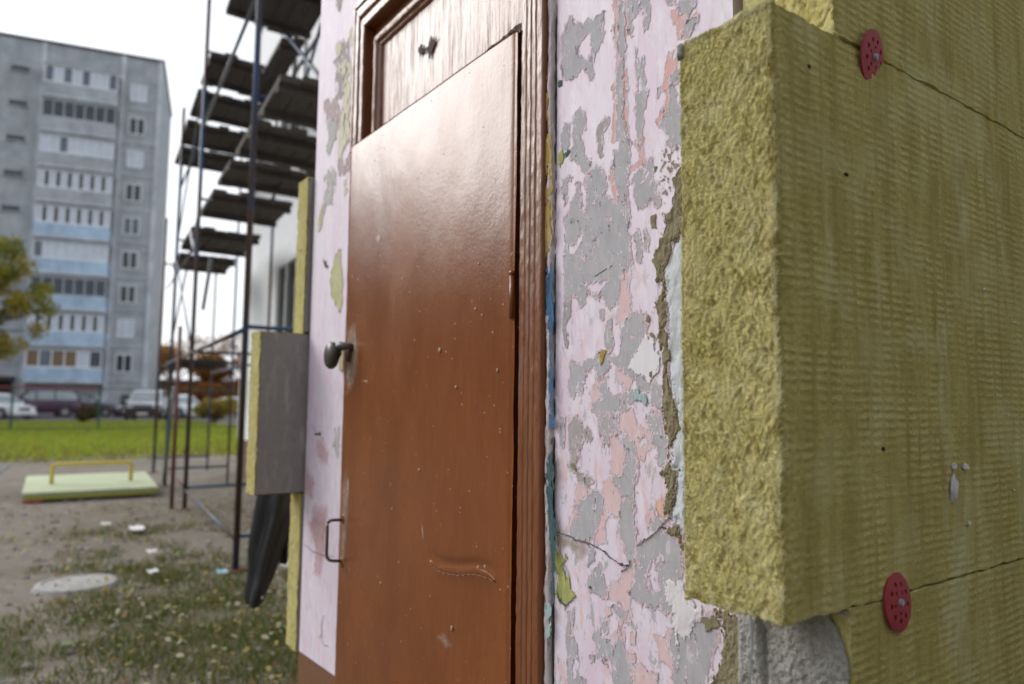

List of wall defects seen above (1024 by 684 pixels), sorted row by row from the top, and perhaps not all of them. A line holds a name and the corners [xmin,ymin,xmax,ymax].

peeling [323,248,344,313]
peeling [317,27,353,231]
crack [552,4,679,684]
peeling [544,0,738,684]